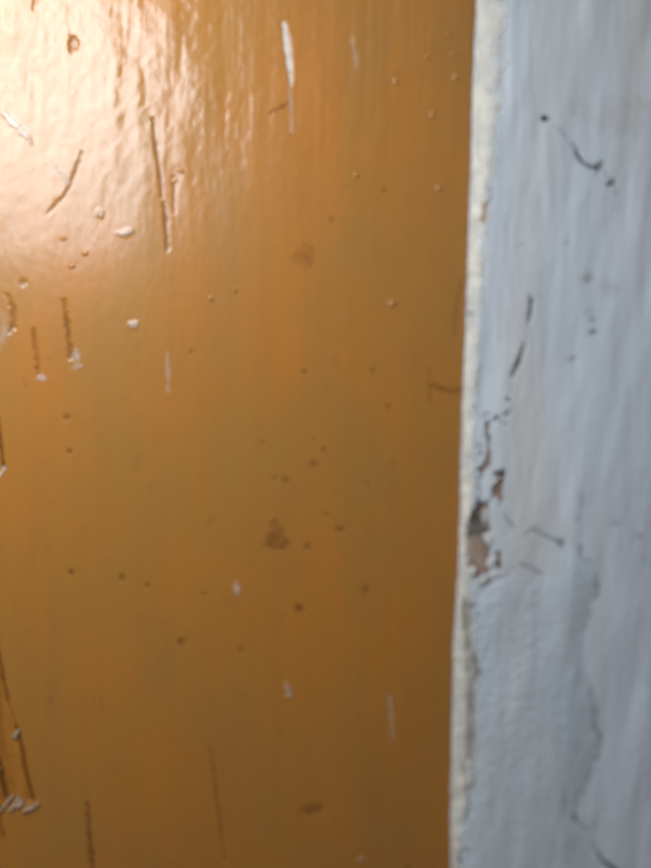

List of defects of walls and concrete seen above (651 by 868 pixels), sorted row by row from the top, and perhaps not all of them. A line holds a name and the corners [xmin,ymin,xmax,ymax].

crack [573,145,615,187]
crack [484,348,524,419]
flaking render [466,422,505,586]
flaking render [463,600,480,787]